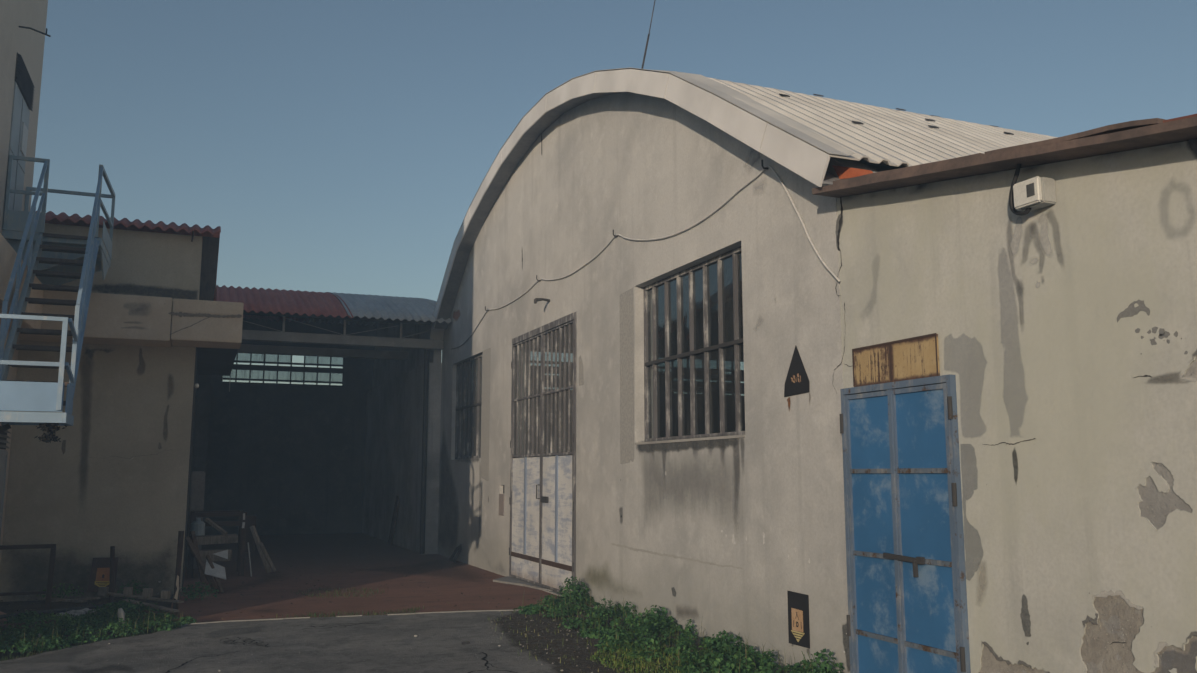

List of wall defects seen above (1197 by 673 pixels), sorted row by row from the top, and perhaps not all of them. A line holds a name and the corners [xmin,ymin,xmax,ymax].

peeling [1117,300,1197,382]
water stain [638,433,739,475]
flaking render [1137,462,1193,530]
flaking render [979,642,1050,673]
flaking render [1081,591,1197,673]